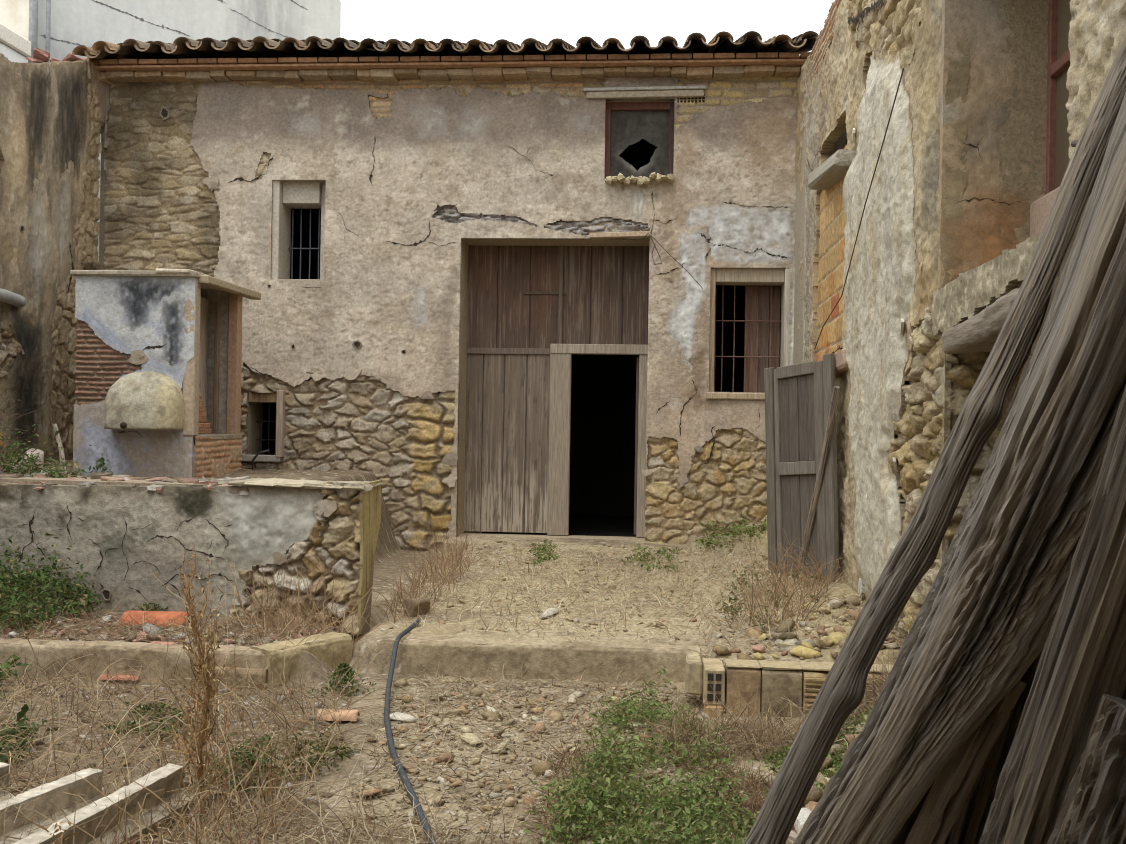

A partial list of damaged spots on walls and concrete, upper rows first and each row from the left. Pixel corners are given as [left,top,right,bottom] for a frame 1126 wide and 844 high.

damp [29,77,82,172]
damp [33,188,69,277]
spalling [27,47,221,475]
crack [656,233,792,275]
damp [15,316,39,442]
damp [122,282,178,366]
spalling [886,305,951,540]
crack [18,506,45,562]
crack [60,503,234,603]
spalling [227,363,460,641]
spalling [642,428,767,545]
spalling [891,526,949,638]